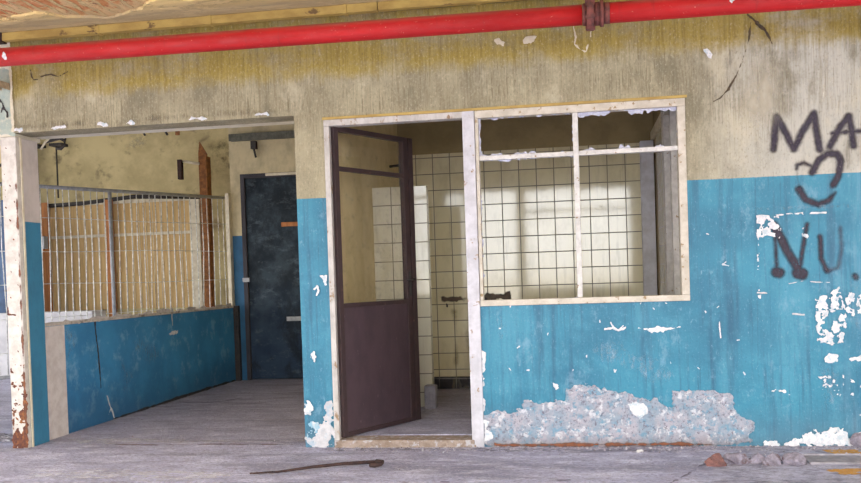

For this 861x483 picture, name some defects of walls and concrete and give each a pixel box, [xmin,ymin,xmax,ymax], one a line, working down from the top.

spalling [0,0,149,18]
crack [713,14,772,102]
peeling [756,212,827,270]
peeling [789,281,861,363]
corrosion [10,331,29,448]
peeling [304,400,335,448]
spalling [483,383,861,453]